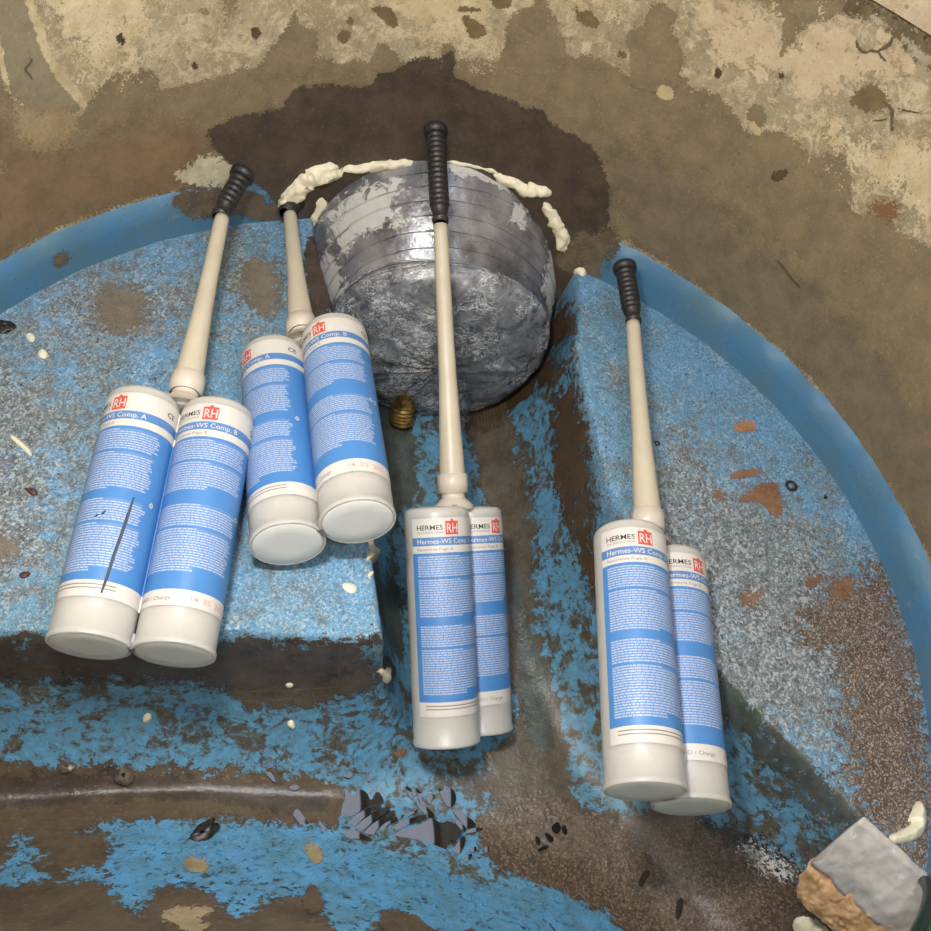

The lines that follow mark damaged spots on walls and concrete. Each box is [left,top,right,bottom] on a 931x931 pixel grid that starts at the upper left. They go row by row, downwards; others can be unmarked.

water stain [0,0,931,560]
rust [733,420,757,433]
peeling [0,746,355,931]